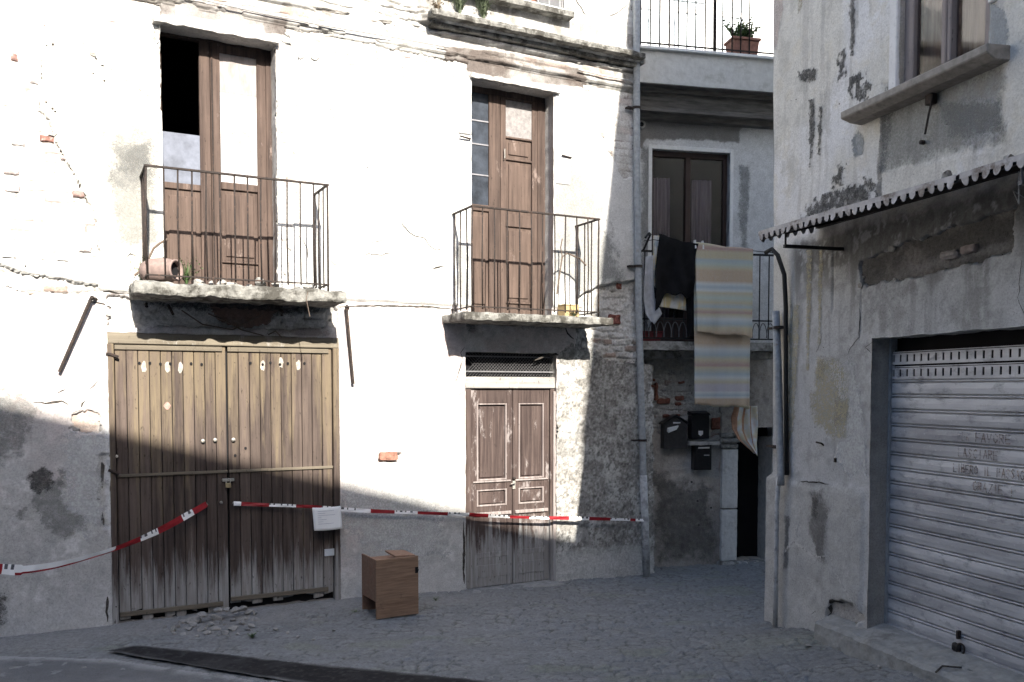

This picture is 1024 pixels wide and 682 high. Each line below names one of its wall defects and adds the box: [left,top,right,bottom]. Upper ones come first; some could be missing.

damp [797,68,817,83]
damp [836,0,872,102]
spalling [0,0,337,331]
spalling [276,29,469,279]
spalling [582,81,633,179]
damp [808,99,822,167]
damp [800,115,886,216]
crack [302,199,445,269]
spalling [858,209,1016,289]
spalling [68,410,102,433]
spalling [556,280,721,582]
damp [26,431,107,540]